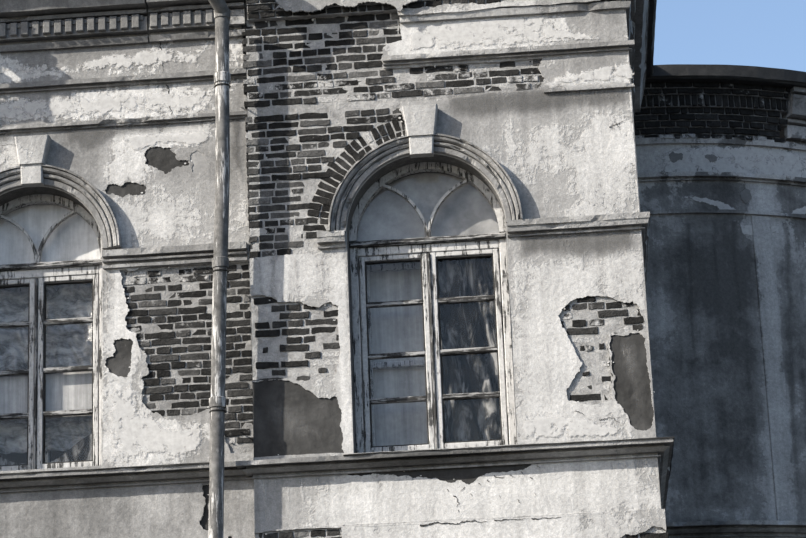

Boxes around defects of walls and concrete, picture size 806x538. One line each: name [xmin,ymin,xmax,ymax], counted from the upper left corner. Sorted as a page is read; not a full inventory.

peeling [77,48,199,70]
peeling [559,64,634,82]
peeling [124,132,209,174]
flaking render [634,82,806,184]
flaking render [105,182,146,197]
flaking render [225,0,601,454]
flaking render [109,263,213,463]
flaking render [559,296,645,405]
flaking render [348,464,531,484]
flaking render [200,485,209,530]
flaking render [254,525,344,538]
flaking render [622,526,669,538]